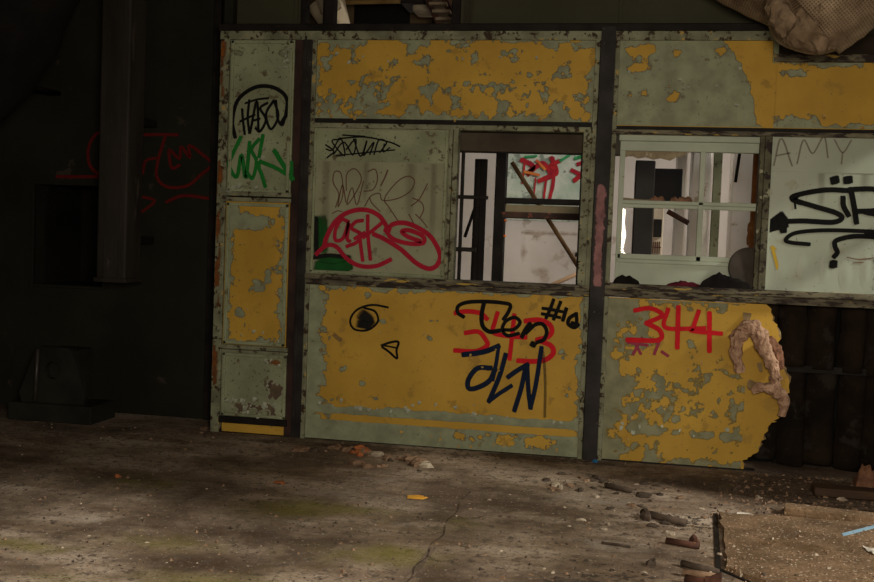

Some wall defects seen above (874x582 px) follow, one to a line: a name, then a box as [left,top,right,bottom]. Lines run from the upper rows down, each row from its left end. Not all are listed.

peeling [315,40,596,122]
peeling [617,41,762,127]
peeling [773,114,874,130]
peeling [779,62,873,78]
peeling [226,206,286,343]
peeling [305,284,584,457]
peeling [597,291,776,469]
crack [404,492,485,580]